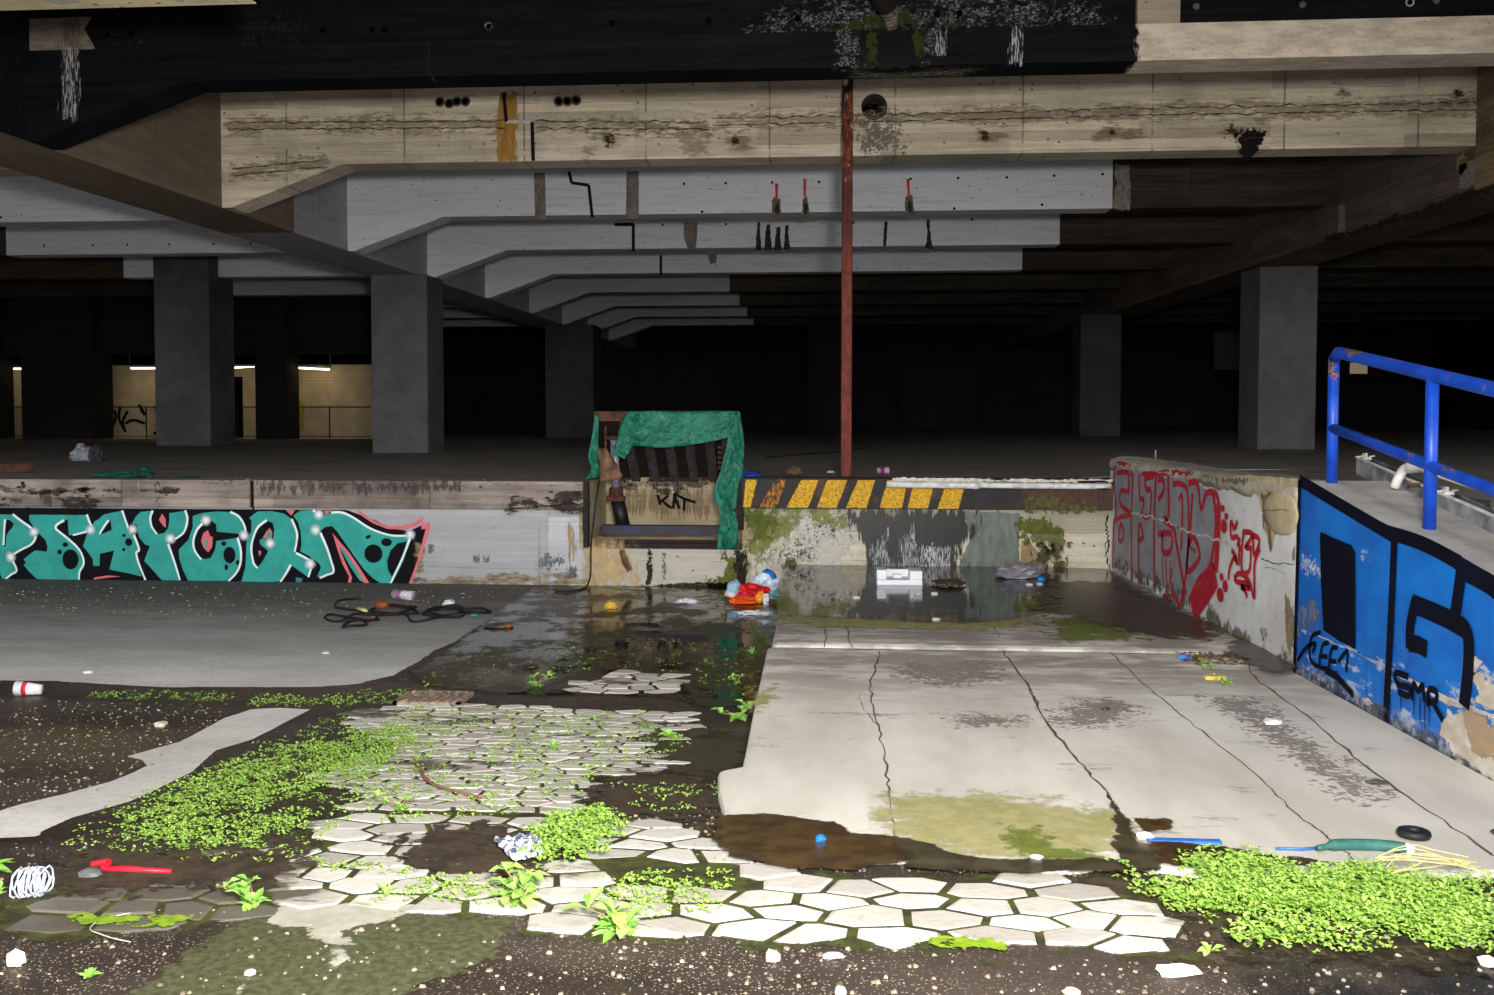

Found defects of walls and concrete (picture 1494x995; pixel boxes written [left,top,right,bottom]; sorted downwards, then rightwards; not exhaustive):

leakage [743,0,1116,79]
corrosion [496,91,518,163]
leakage [755,509,982,577]
spalling [1200,475,1298,552]
peeling [1292,546,1321,577]
peeling [1284,594,1322,652]
crack [768,626,899,836]
crack [962,627,1120,811]
peeling [1393,656,1494,781]